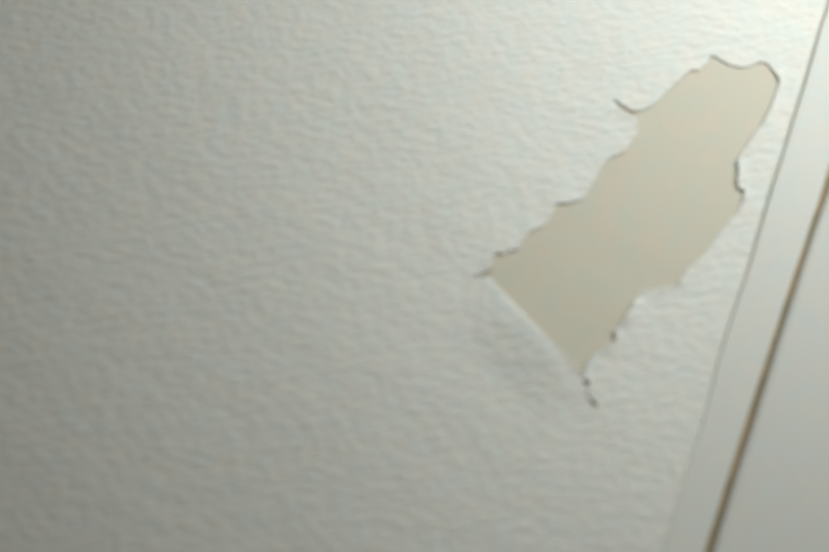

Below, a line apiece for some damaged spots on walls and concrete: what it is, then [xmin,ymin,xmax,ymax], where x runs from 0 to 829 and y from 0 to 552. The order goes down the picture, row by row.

peeling [444,35,796,431]